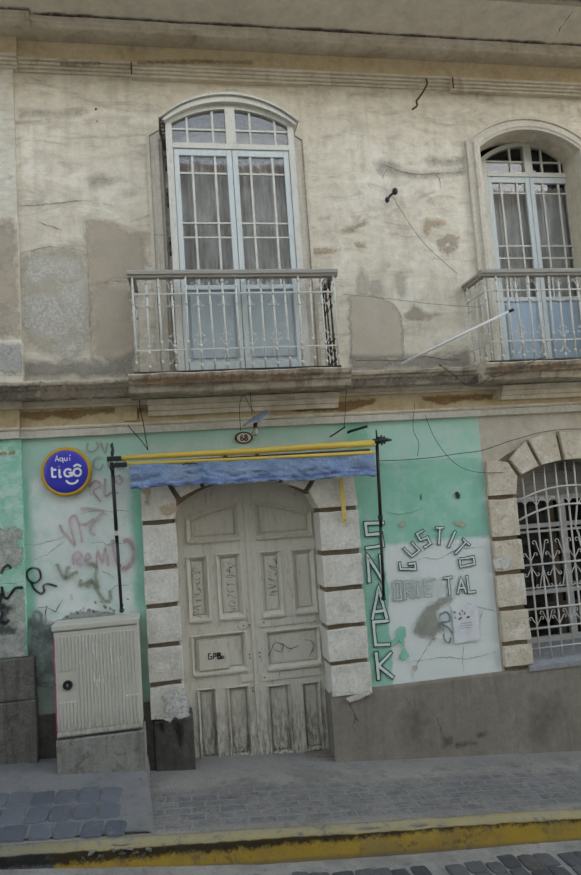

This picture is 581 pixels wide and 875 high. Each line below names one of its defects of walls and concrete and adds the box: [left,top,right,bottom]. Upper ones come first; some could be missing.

peeling [0,222,87,374]
peeling [155,688,190,722]